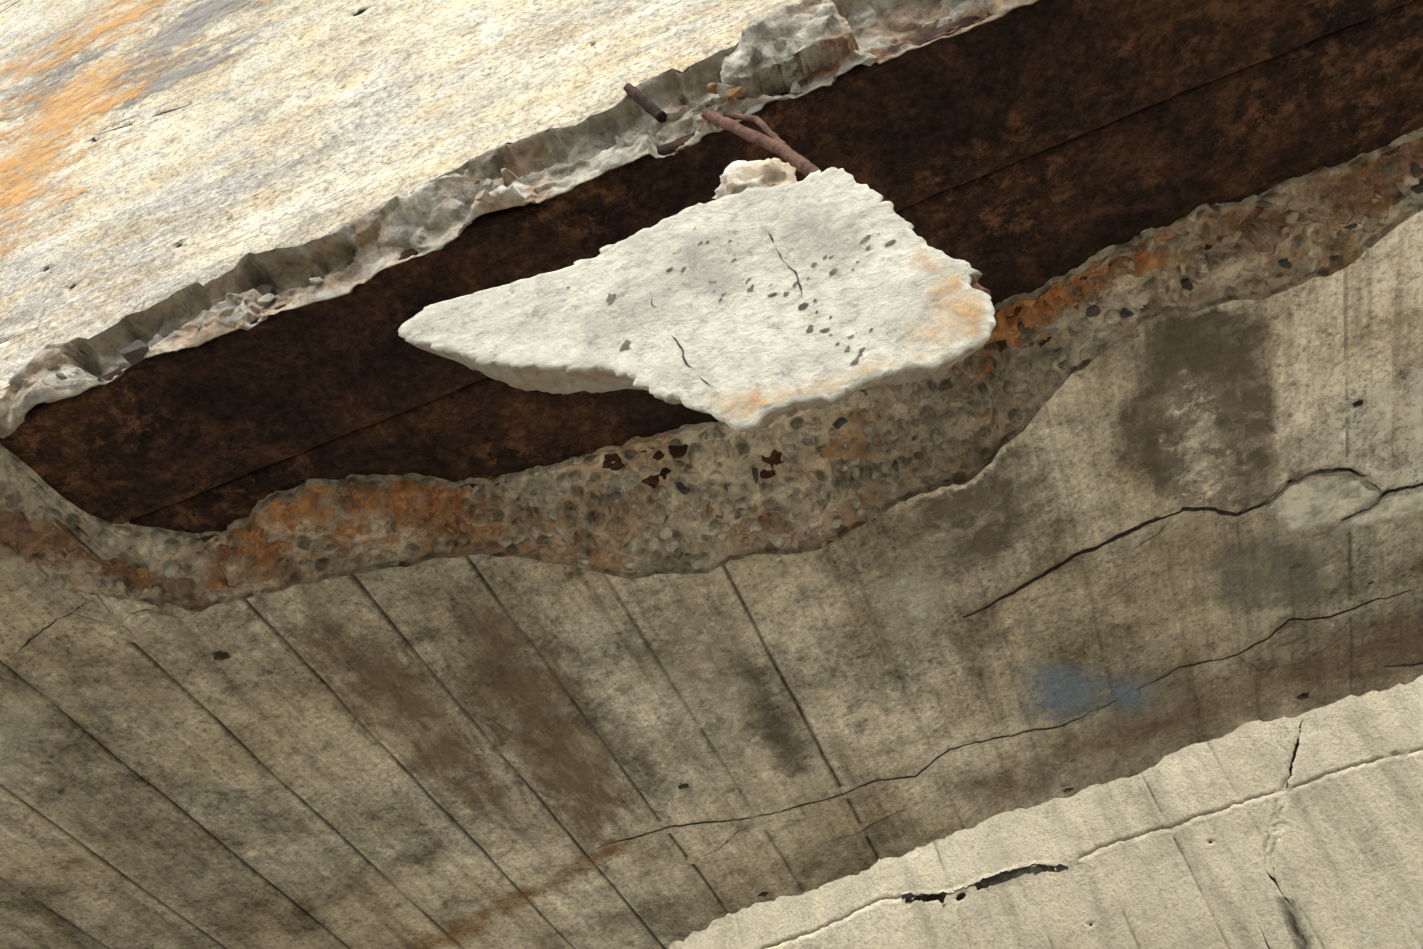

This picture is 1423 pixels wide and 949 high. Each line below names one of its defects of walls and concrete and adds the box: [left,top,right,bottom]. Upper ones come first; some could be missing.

rust [0,0,186,257]
rust [798,31,914,86]
rust [1204,137,1423,263]
spalling [0,0,1423,612]
rust [962,231,1180,389]
leakage [1119,311,1279,509]
crack [962,457,1423,619]
crack [597,585,1412,849]
crack [1383,656,1423,672]
crack [742,718,1423,949]